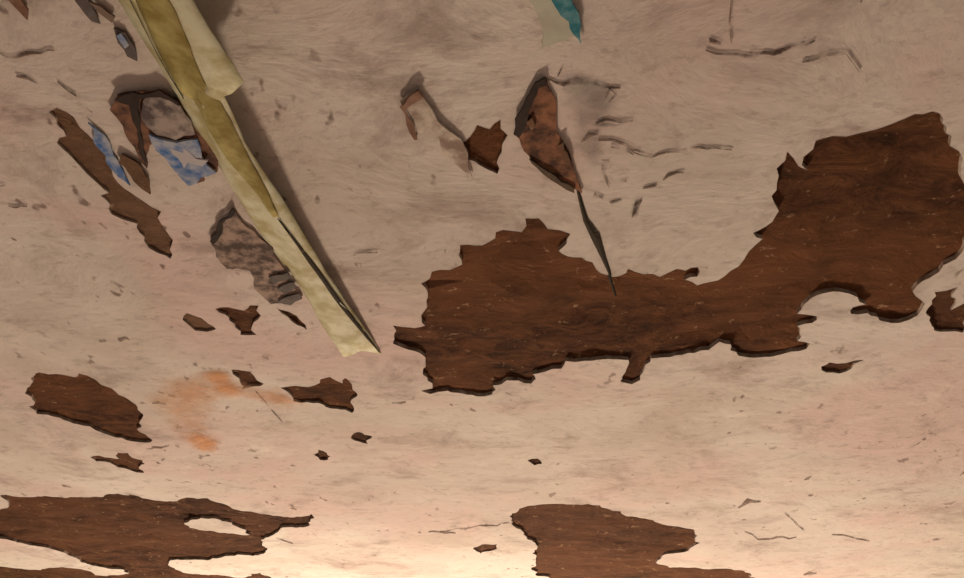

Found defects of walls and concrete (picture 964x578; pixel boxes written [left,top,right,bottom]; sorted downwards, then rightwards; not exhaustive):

peeling [9,0,29,20]
peeling [400,77,582,193]
peeling [49,0,381,357]
spalling [393,112,964,396]
spalling [25,372,152,443]
spalling [91,453,144,473]
spalling [232,370,263,389]
spalling [282,377,357,413]
spalling [351,432,372,444]
spalling [0,494,314,578]
spalling [510,504,754,578]